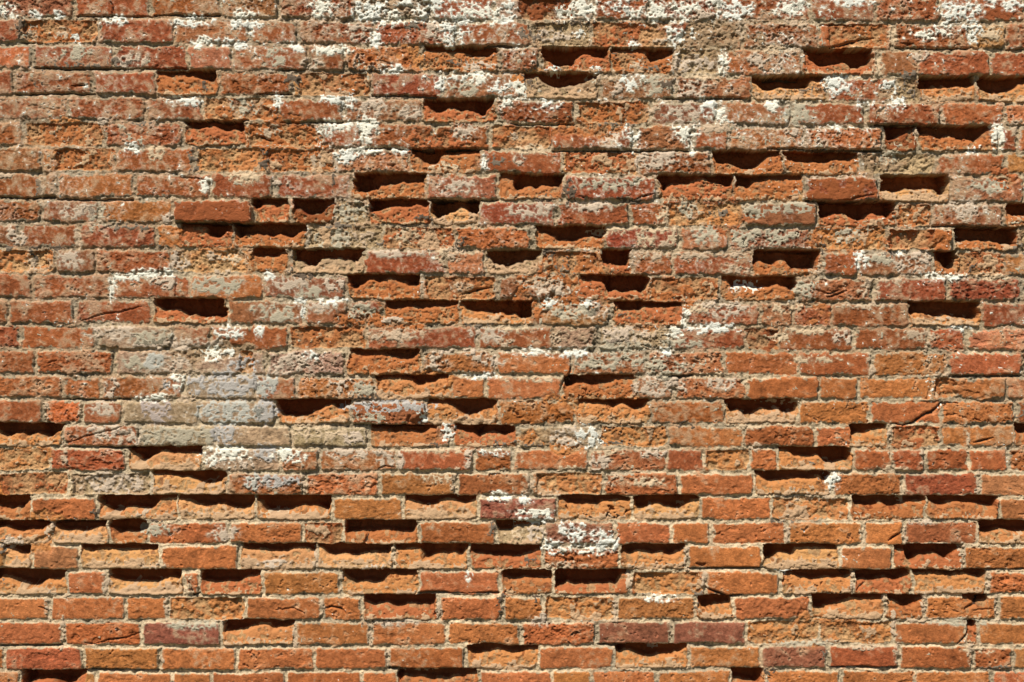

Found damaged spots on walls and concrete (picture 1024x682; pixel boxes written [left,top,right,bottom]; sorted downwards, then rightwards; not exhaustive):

peeling [299,57,324,88]
water stain [335,43,390,80]
water stain [496,15,597,92]
water stain [887,26,899,44]
water stain [982,26,1005,41]
spalling [502,9,770,222]
spalling [493,125,526,165]
peeling [656,166,1018,275]
peeling [832,330,852,344]
peeling [0,193,750,570]